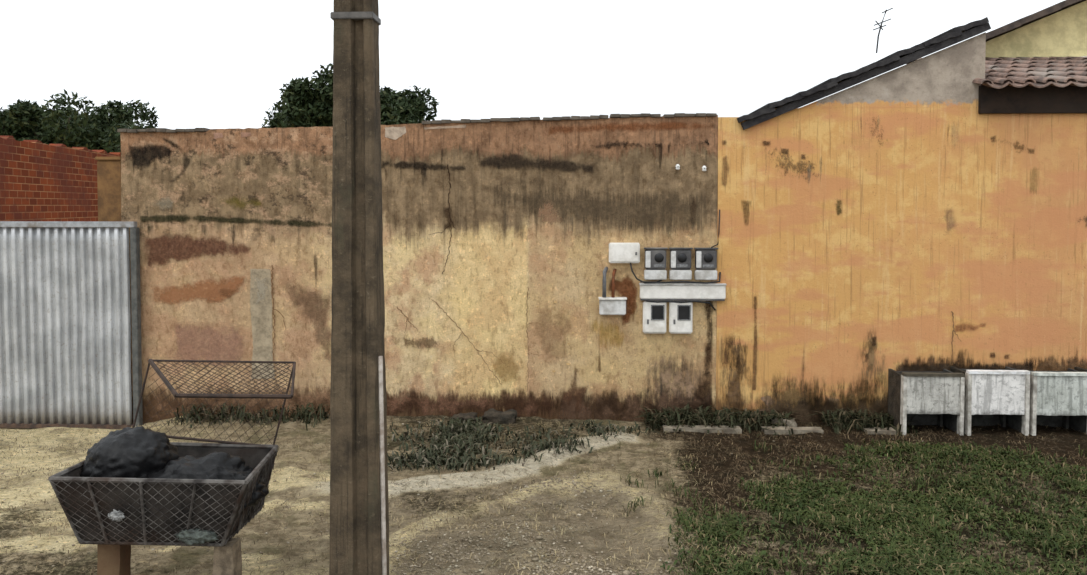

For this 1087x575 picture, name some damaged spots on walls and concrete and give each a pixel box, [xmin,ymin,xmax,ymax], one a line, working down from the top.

water stain [382,150,466,176]
water stain [477,151,593,171]
water stain [596,142,662,165]
crack [429,165,457,274]
water stain [495,188,706,230]
corrosion [609,277,637,323]
crack [431,288,540,389]
water stain [386,297,888,423]
water stain [896,352,1087,372]